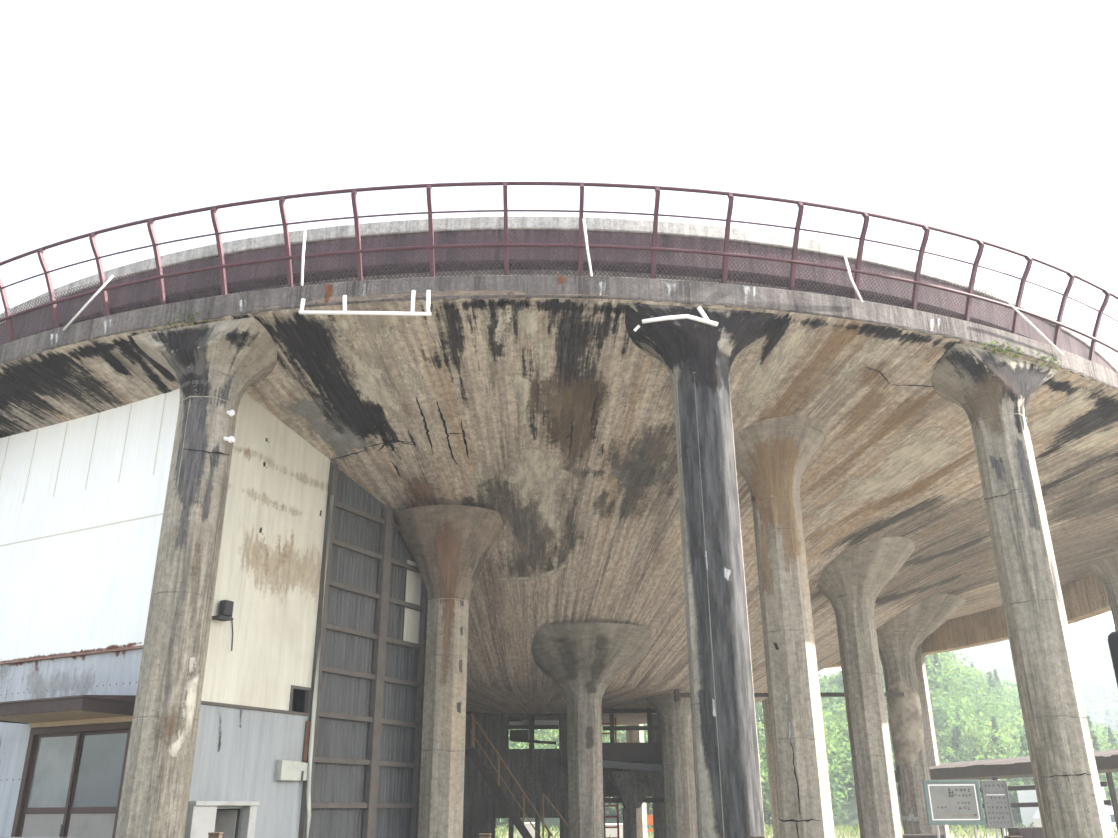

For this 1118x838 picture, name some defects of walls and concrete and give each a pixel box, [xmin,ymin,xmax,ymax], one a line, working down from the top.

leakage [0,282,708,570]
crack [332,397,469,477]
leakage [734,314,1118,594]
leakage [875,572,966,605]
rust [2,642,142,670]
crack [778,736,821,838]